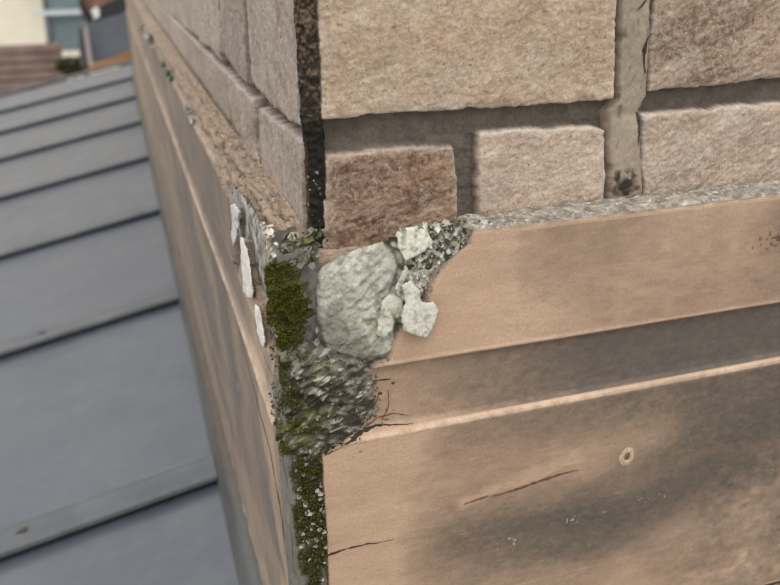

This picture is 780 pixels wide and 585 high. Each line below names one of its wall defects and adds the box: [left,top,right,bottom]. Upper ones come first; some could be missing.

damp [614,172,639,196]
crack [327,539,394,556]
spalling [226,181,501,472]
damp [454,303,780,561]